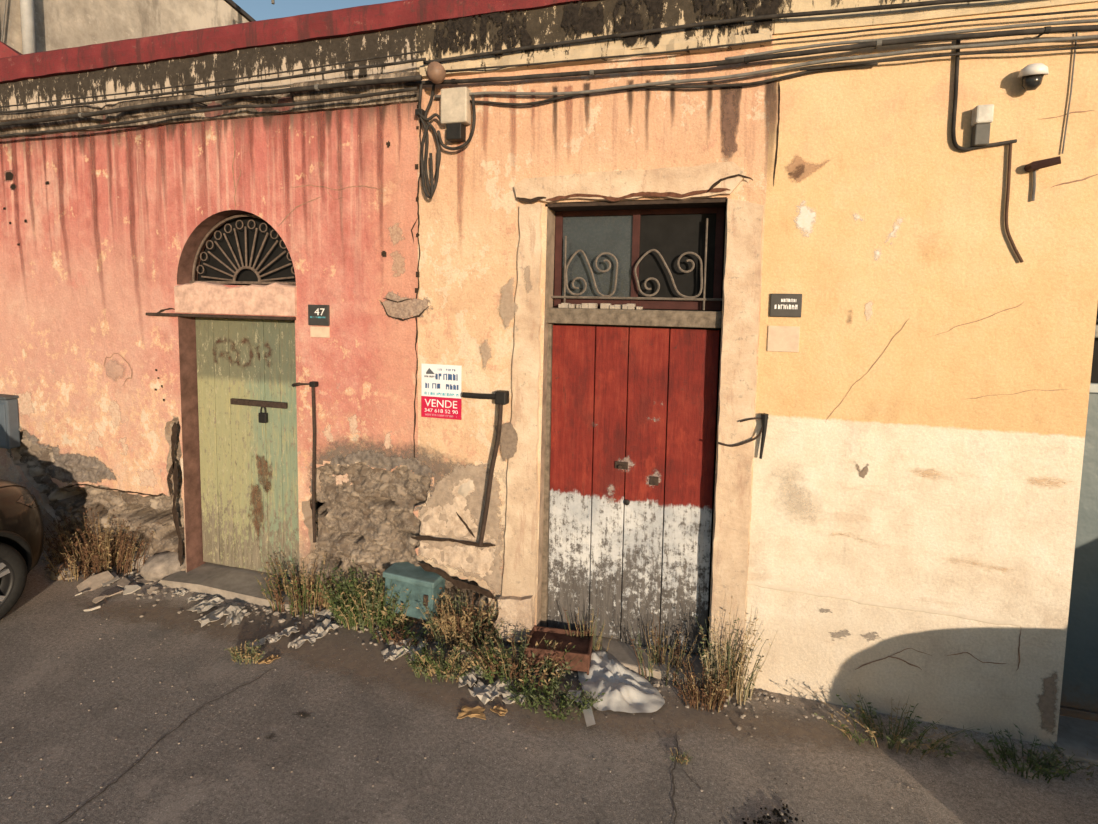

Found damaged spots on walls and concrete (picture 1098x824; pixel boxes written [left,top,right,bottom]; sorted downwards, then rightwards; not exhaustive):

water stain [434,10,533,59]
water stain [561,0,664,46]
water stain [765,77,777,128]
water stain [0,121,145,234]
peeling [794,201,816,237]
spalling [787,156,827,182]
crack [826,320,908,420]
spalling [7,391,186,571]
spalling [307,415,536,642]
crack [855,626,1021,671]
crack [59,667,275,824]
crack [671,734,679,824]